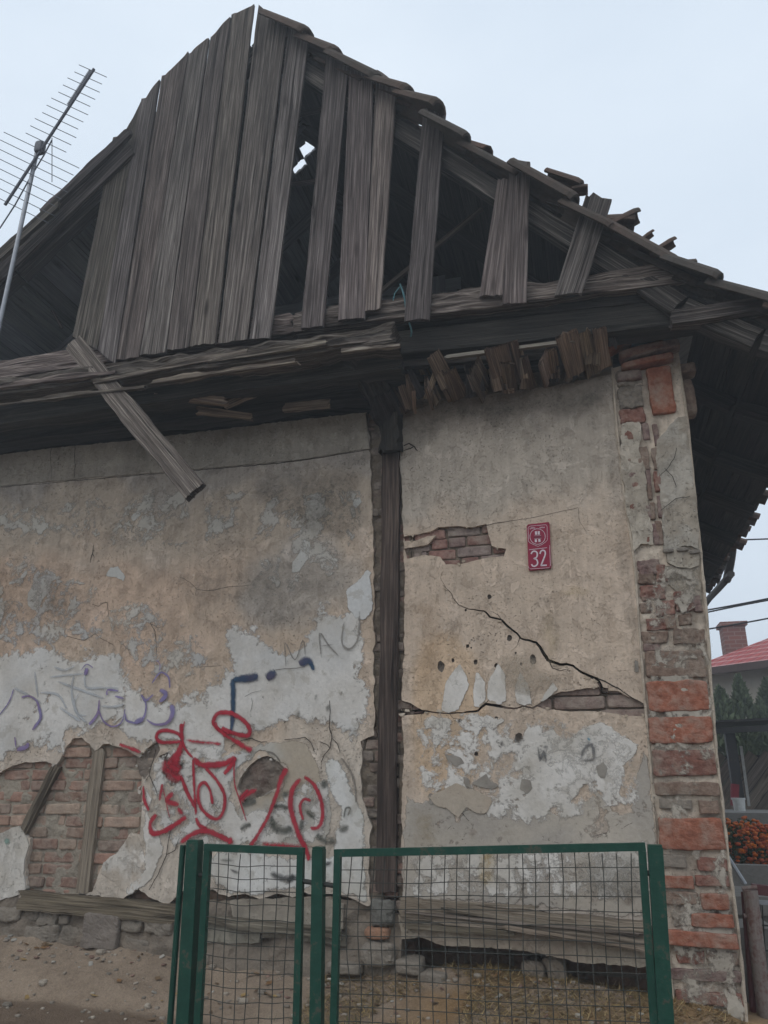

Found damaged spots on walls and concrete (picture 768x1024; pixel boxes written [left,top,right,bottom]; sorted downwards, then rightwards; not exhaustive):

flaking render [400,523,506,566]
flaking render [663,547,702,600]
crack [442,581,643,704]
peeling [0,491,373,902]
crack [399,700,540,721]
peeling [402,635,656,917]
flaking render [398,915,646,968]